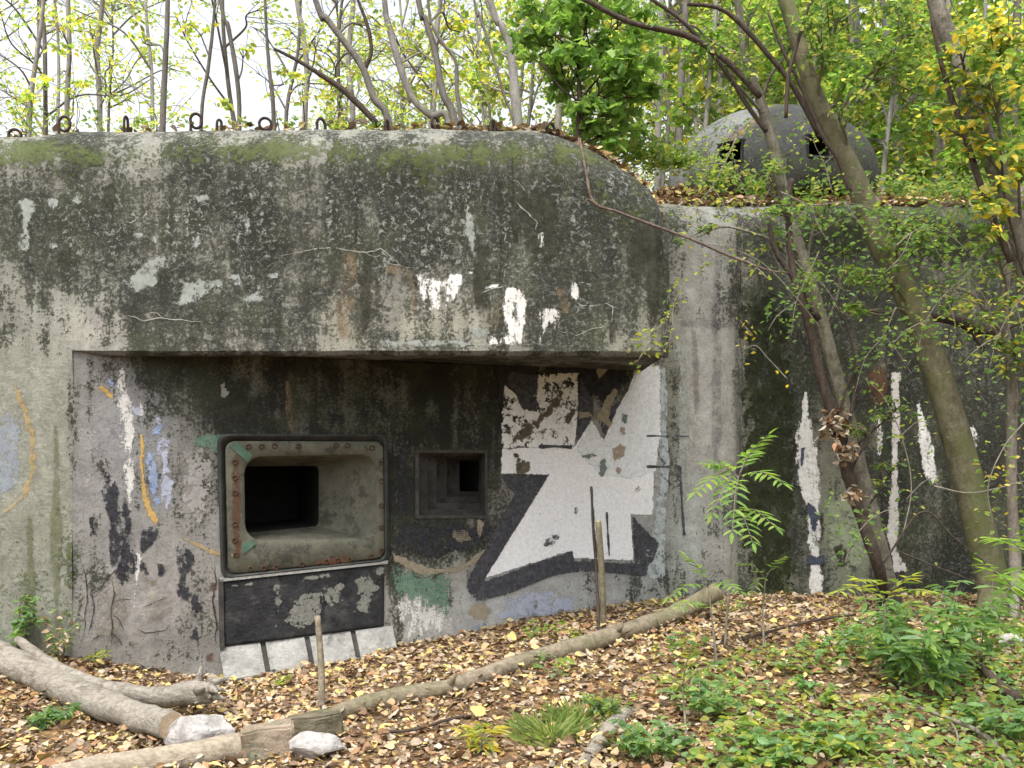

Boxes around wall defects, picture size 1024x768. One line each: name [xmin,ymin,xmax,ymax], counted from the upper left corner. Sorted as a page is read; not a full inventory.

crack [128,312,219,343]
crack [282,247,410,268]
water stain [354,218,373,333]
peeling [379,267,527,347]
water stain [473,156,569,316]
peeling [539,308,559,340]
peeling [513,388,628,477]
water stain [676,345,690,508]
rust [232,454,241,558]
crack [82,564,170,646]
peeling [273,519,496,629]
water stain [833,544,847,566]